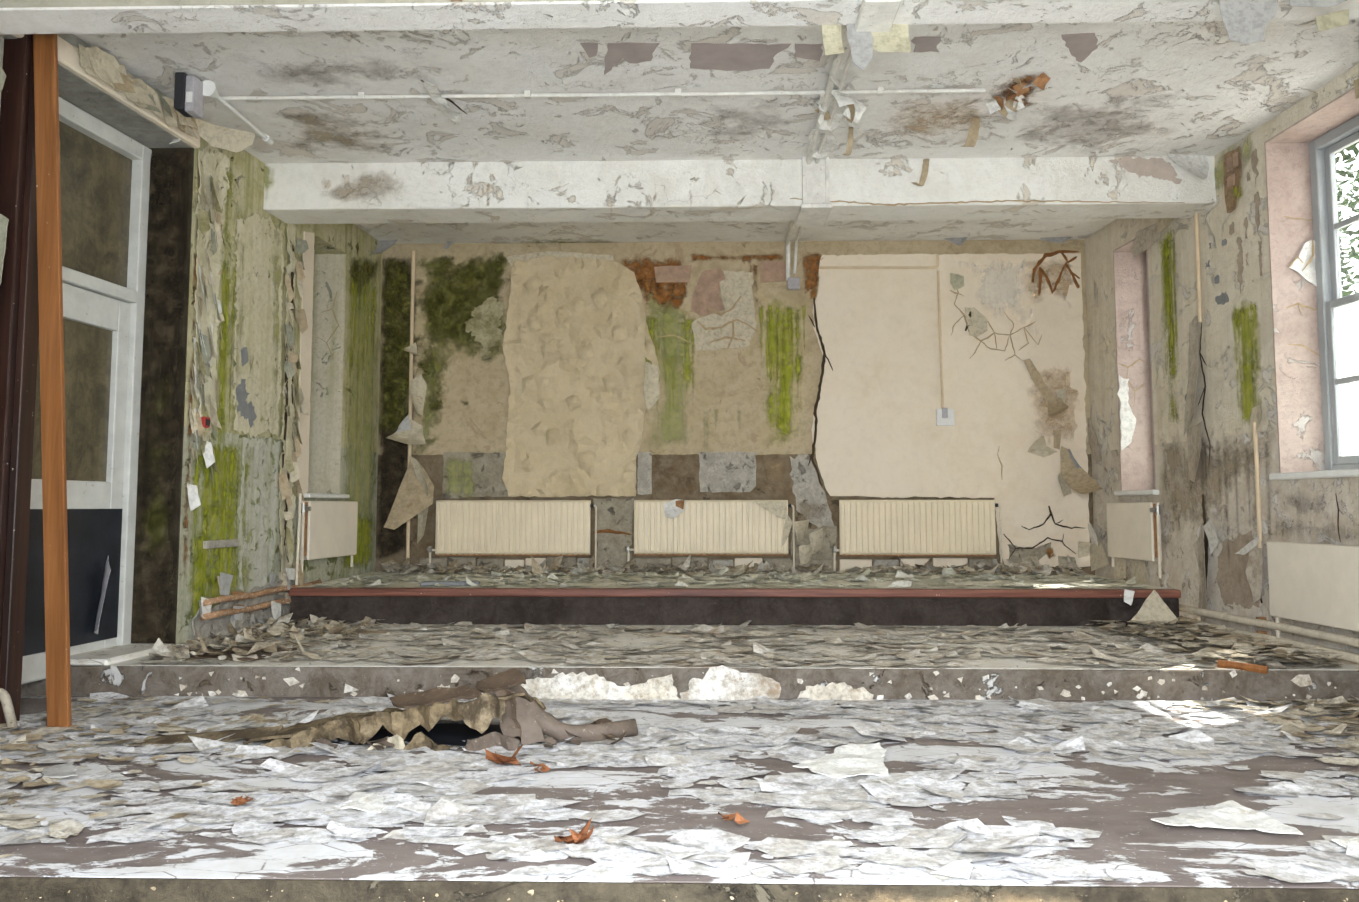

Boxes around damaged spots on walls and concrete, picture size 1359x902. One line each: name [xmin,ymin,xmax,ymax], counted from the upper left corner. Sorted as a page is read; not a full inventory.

peeling [580,42,660,75]
rust [986,72,1051,120]
peeling [0,214,9,284]
rust [622,254,782,309]
crack [790,198,1182,206]
crack [950,250,1080,361]
water stain [1159,239,1177,346]
water stain [131,150,248,644]
water stain [350,257,506,558]
crack [808,298,833,486]
flaking render [384,359,1179,627]
crack [1003,506,1081,560]